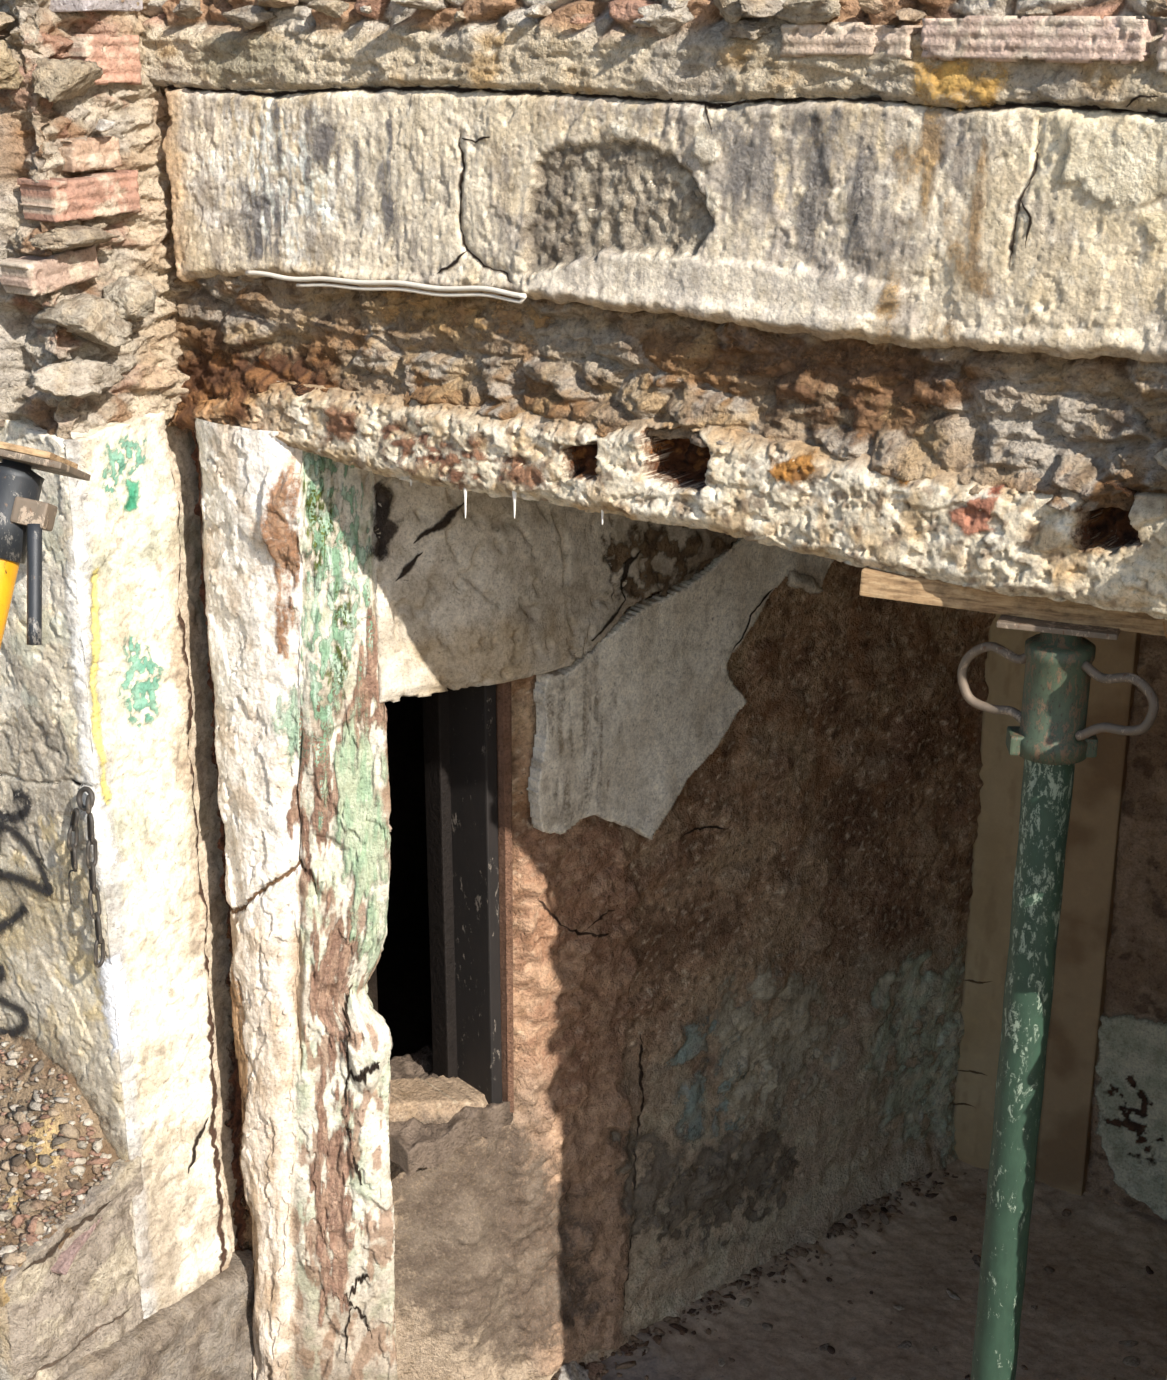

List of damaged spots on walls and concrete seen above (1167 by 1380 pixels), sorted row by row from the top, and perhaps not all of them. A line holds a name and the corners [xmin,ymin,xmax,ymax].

damp [241,184,281,260]
damp [272,102,283,167]
damp [304,104,400,232]
crack [167,84,1167,283]
spalling [563,442,598,481]
spalling [641,426,710,491]
spalling [1071,481,1141,554]
flaking render [527,524,835,840]
crack [171,470,318,1273]
flaking render [1095,1013,1167,1220]
crack [332,1273,372,1364]